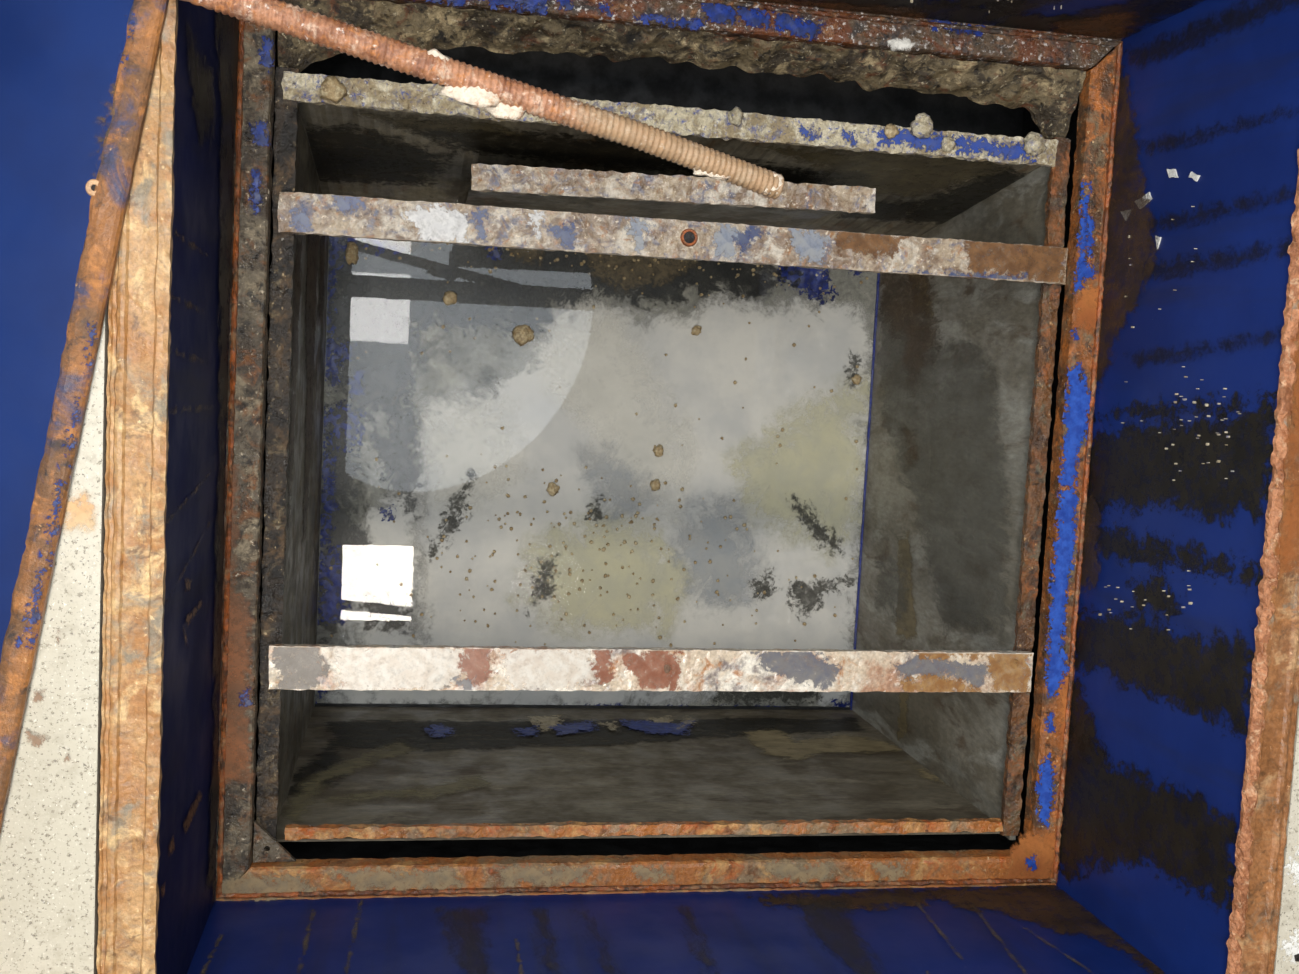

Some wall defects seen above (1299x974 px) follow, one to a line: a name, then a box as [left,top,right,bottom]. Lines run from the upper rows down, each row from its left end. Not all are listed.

damp [765,0,1298,65]
corrosion [85,177,99,196]
peeling [842,127,1037,163]
peeling [1072,181,1098,295]
corrosion [1072,65,1158,388]
damp [1143,240,1291,279]
corrosion [879,273,941,383]
damp [1093,391,1278,422]
peeling [1043,362,1092,733]
corrosion [1080,495,1102,592]
damp [1093,520,1263,622]
peeling [1035,752,1056,829]